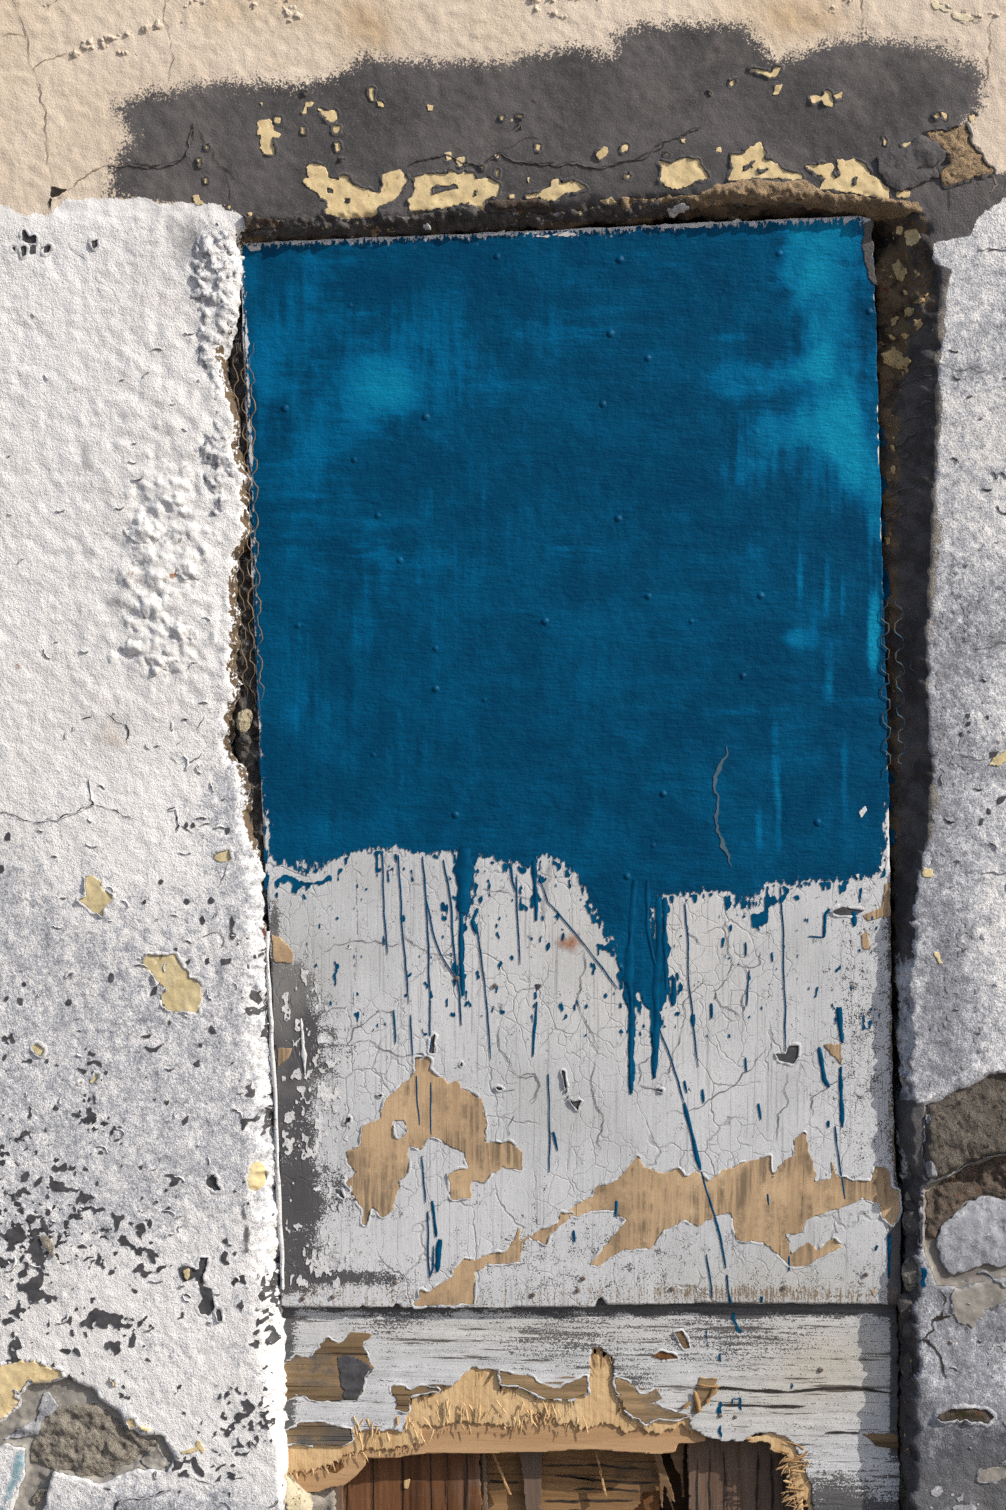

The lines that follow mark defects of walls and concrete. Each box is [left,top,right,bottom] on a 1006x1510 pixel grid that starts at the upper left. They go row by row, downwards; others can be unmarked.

spalling [217,84,997,373]
peeling [922,670,1006,877]
peeling [333,1031,524,1227]
crack [497,1026,540,1135]
crack [577,951,604,1148]
crack [638,921,766,1113]
crack [776,1075,849,1142]
spalling [0,999,375,1510]
peeling [410,1130,1006,1386]
peeling [389,1383,441,1414]
peeling [497,1369,591,1402]
peeling [612,1373,689,1426]